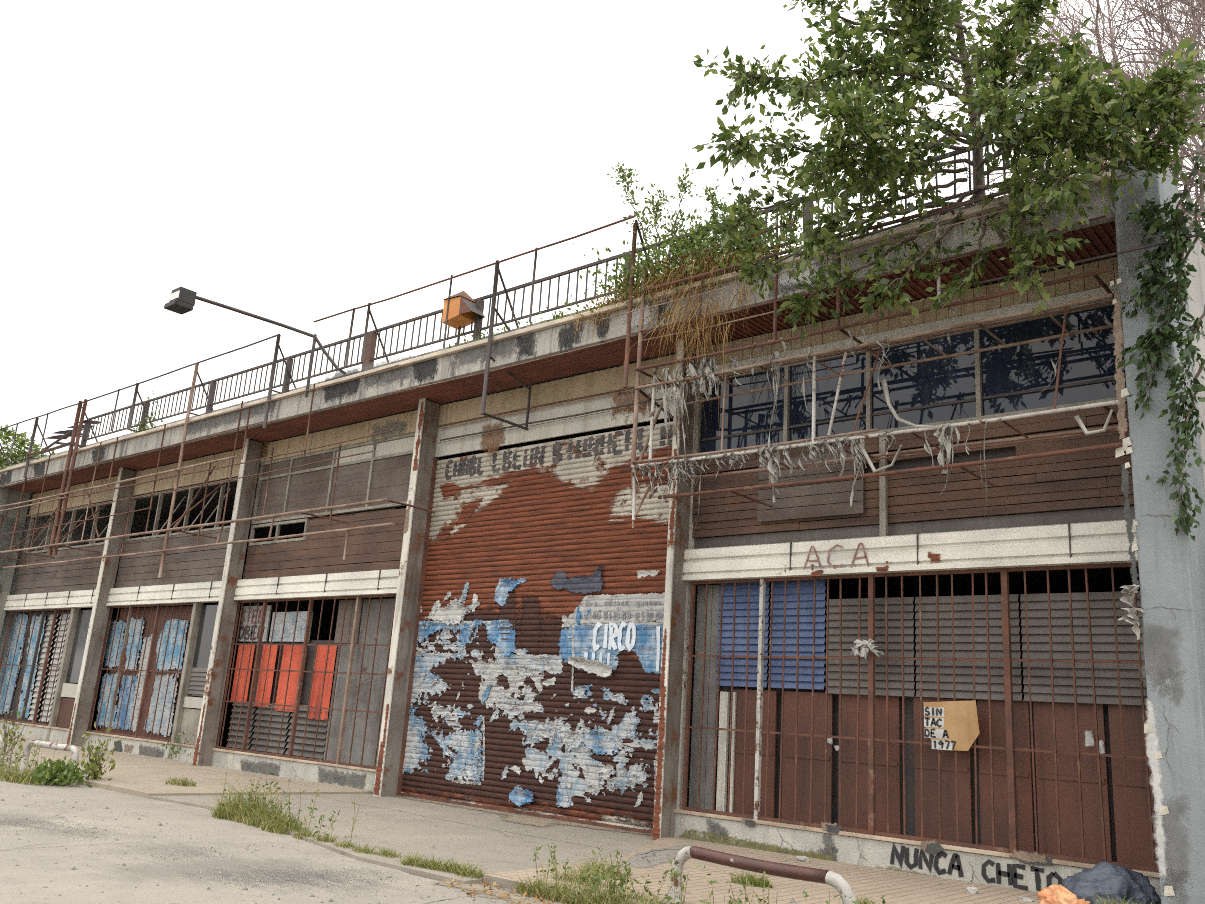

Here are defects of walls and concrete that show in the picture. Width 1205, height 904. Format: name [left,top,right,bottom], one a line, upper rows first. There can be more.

corrosion [481,423,505,460]
corrosion [417,445,672,647]
corrosion [401,620,667,840]